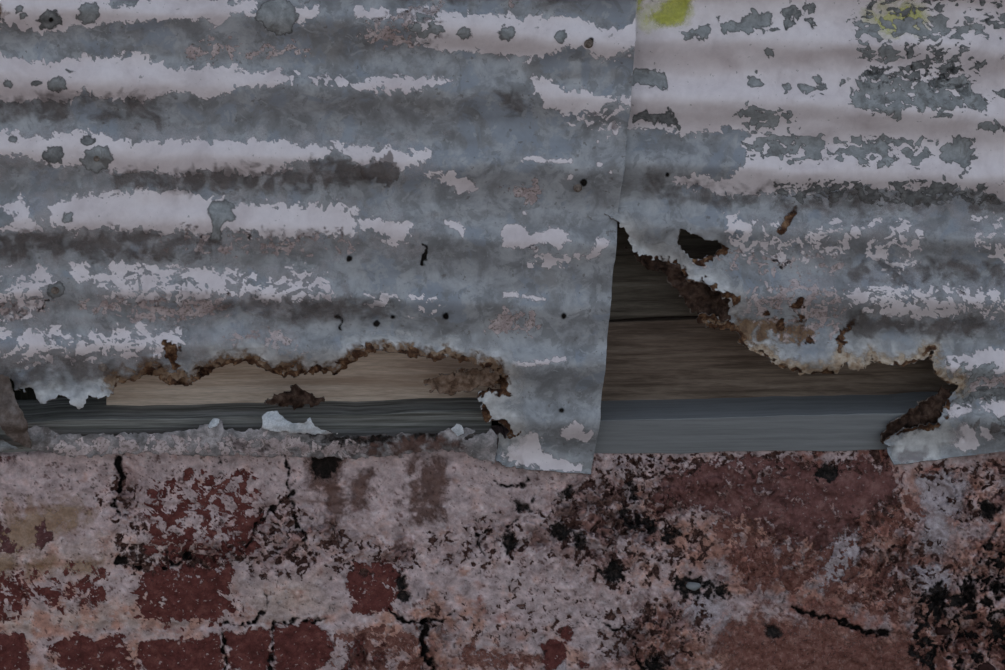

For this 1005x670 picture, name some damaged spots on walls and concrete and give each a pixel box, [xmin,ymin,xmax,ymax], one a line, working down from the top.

peeling [0,0,453,104]
peeling [351,0,1005,345]
peeling [0,128,479,370]
corrosion [624,243,842,375]
crack [110,456,126,513]
corrosion [103,339,521,439]
corrosion [880,345,957,444]
water stain [892,409,956,463]
crack [388,608,455,670]
water stain [670,571,732,634]
crack [791,606,889,637]
water stain [907,471,1005,670]